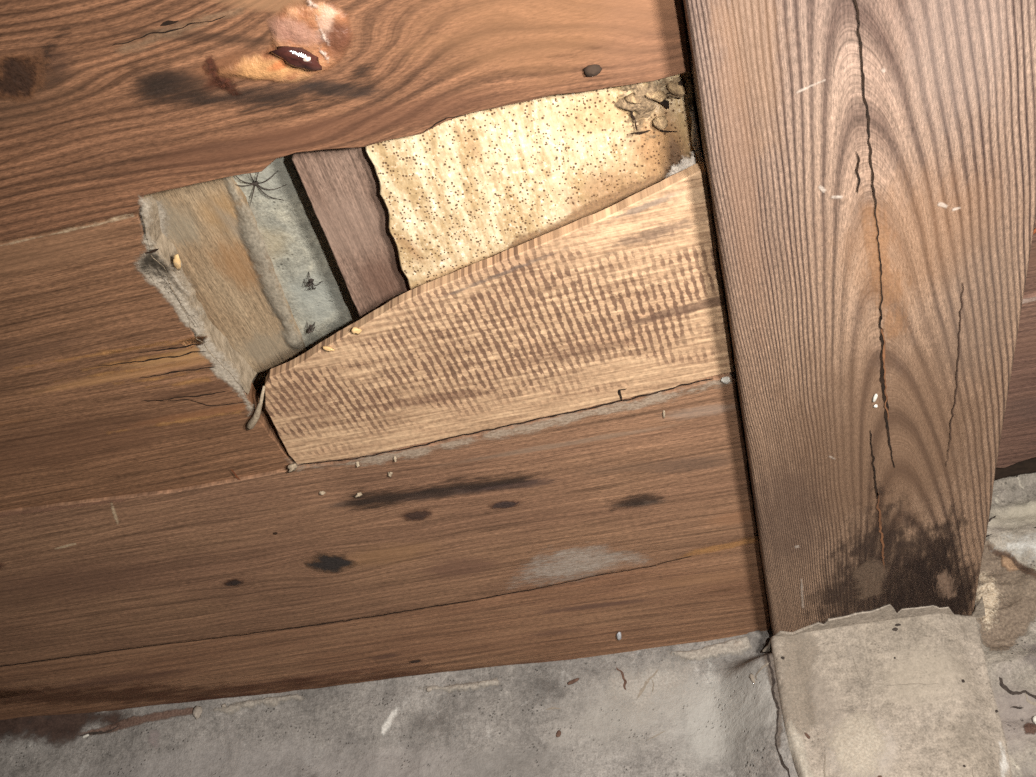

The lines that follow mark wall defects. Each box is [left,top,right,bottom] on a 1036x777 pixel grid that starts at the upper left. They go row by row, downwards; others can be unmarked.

water stain [348,477,529,510]
water stain [611,494,661,511]
water stain [820,504,979,624]
crack [755,641,790,777]